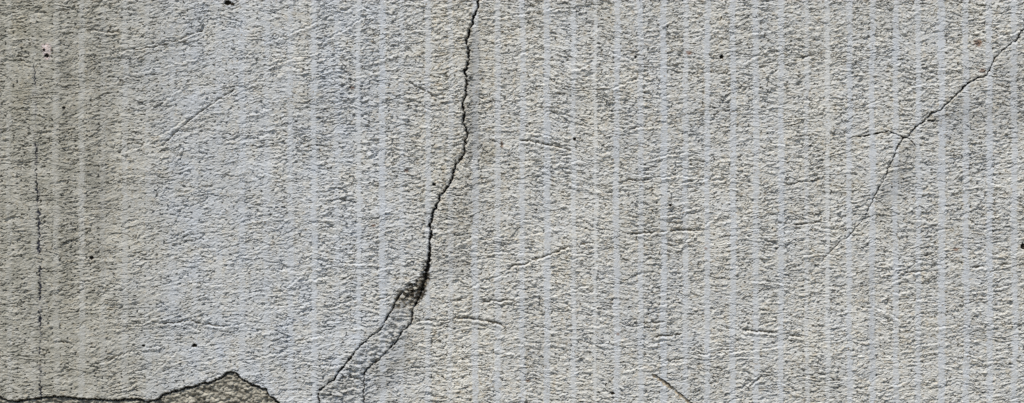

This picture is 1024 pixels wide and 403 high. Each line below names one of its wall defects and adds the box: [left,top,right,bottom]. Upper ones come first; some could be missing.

crack [318,0,516,401]
crack [810,29,1024,273]
spalling [0,371,279,403]